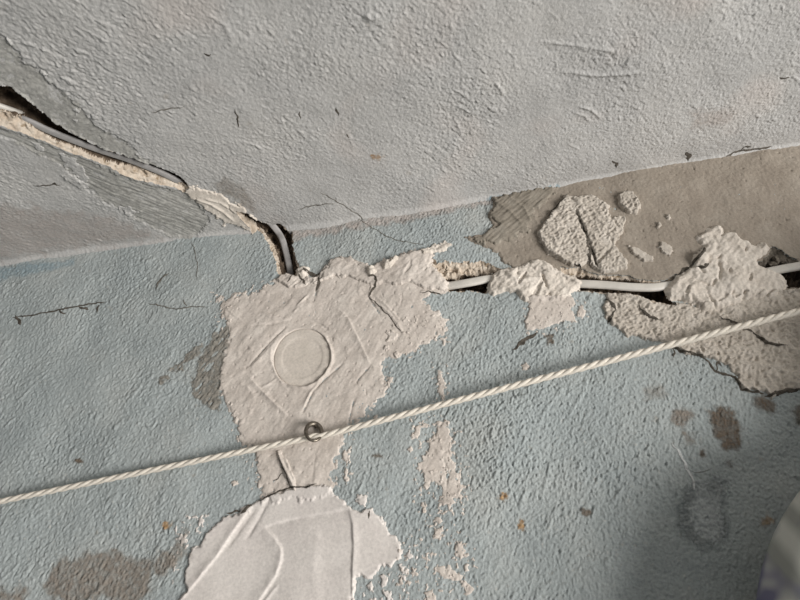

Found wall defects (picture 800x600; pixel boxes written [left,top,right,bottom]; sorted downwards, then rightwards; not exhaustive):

peeling [58,152,89,191]
flaking render [432,145,800,294]
crack [13,302,103,325]
crack [719,316,788,346]
damp [159,343,203,385]
peeling [367,314,451,419]
crack [672,347,800,397]
crack [227,459,314,514]
peeling [355,492,370,507]
peeling [360,415,478,600]
damp [45,544,182,600]
peeling [170,514,209,584]